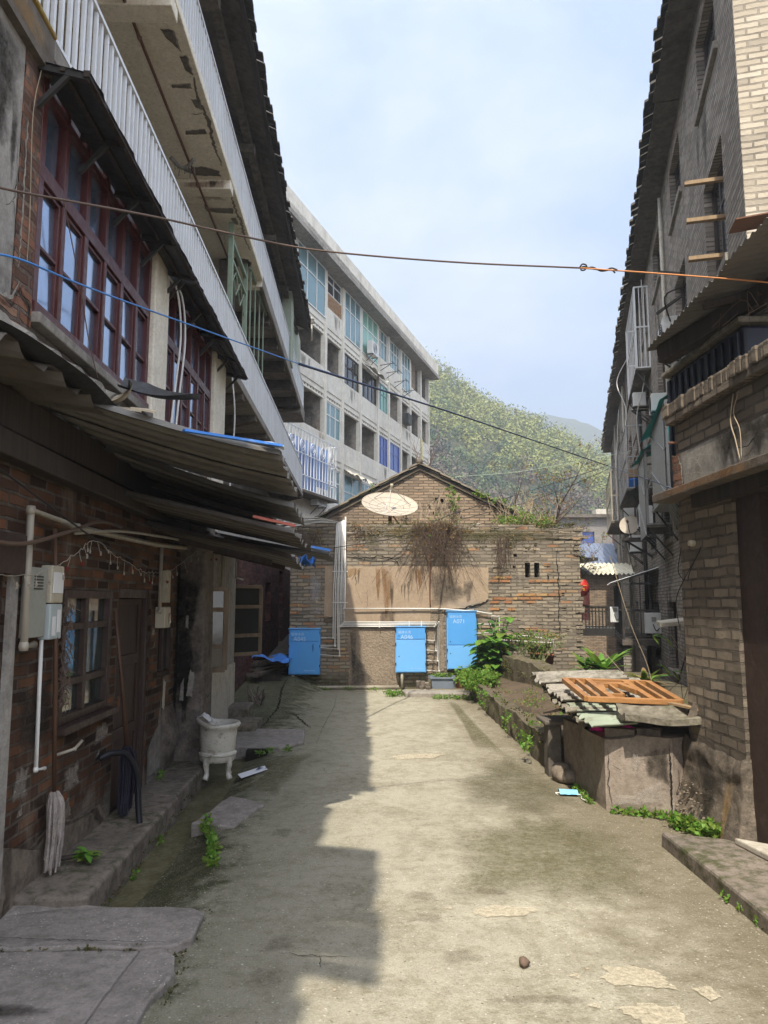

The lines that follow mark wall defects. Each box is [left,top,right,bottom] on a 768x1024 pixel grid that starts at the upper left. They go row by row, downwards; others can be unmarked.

spalling [160,29,222,177]
crack [556,554,565,640]
crack [669,747,685,814]